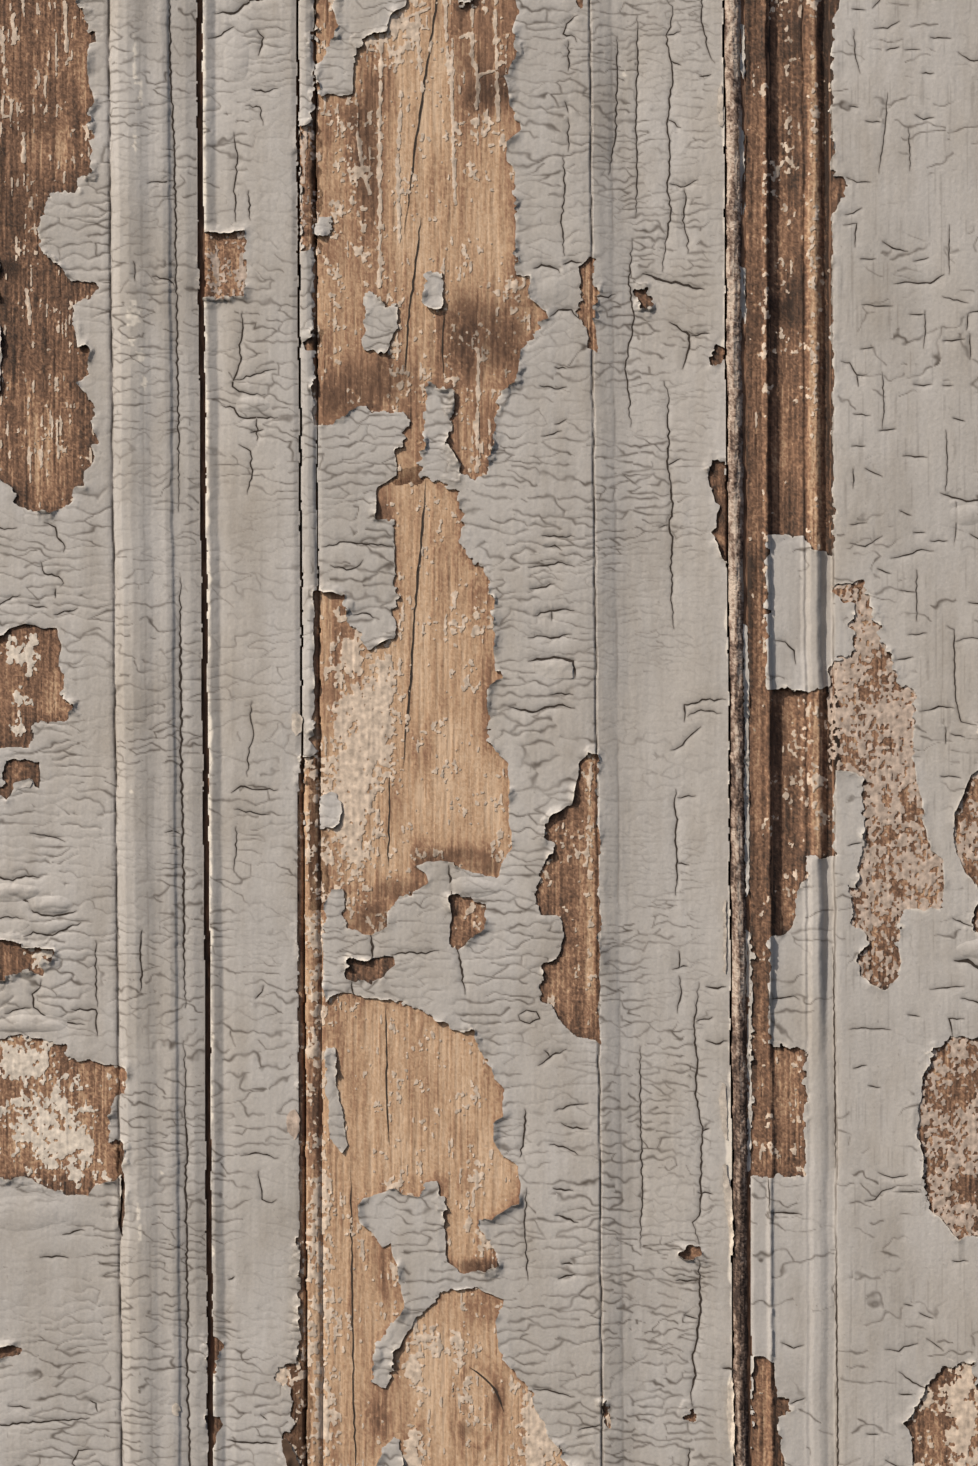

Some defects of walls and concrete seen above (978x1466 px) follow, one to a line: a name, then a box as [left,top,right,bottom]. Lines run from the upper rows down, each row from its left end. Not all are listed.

peeling [0,0,99,513]
crack [133,3,180,511]
crack [551,0,711,427]
peeling [0,624,74,799]
peeling [0,1034,127,1236]
crack [168,582,191,1466]
crack [324,481,426,862]
peeling [274,0,573,1466]
peeling [535,752,602,1045]
crack [675,954,737,1402]
peeling [717,0,978,1178]
crack [844,347,978,778]